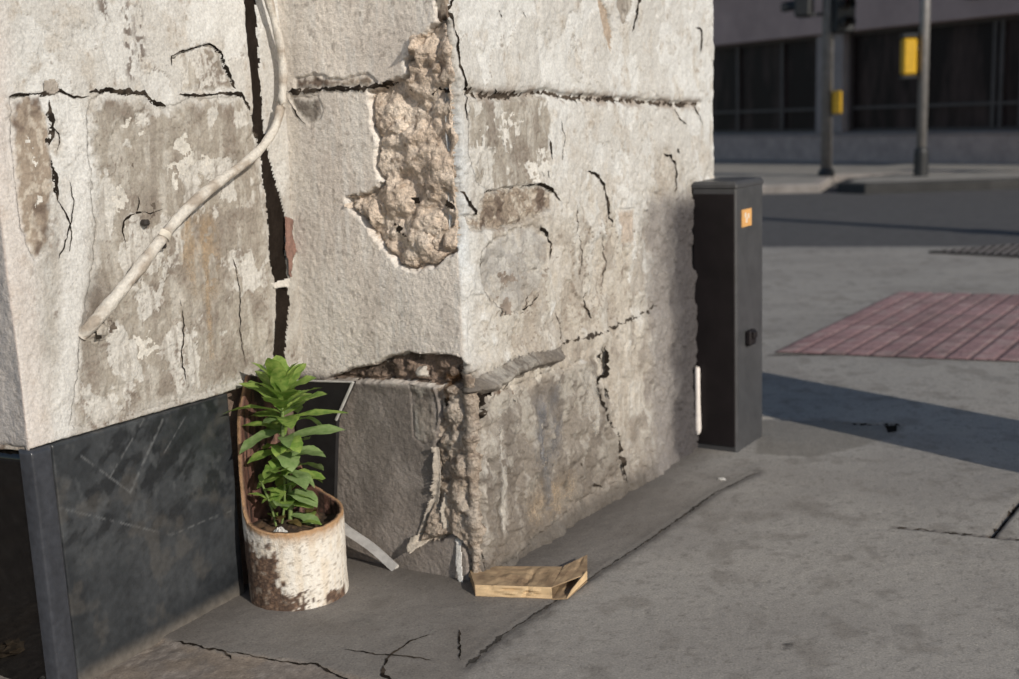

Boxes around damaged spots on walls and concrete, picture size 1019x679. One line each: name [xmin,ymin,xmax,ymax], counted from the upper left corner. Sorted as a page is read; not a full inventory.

crack [287,80,399,124]
crack [447,0,703,148]
crack [9,0,297,359]
spalling [290,0,561,316]
crack [460,191,478,214]
crack [665,149,680,192]
crack [179,300,187,379]
crack [555,171,657,481]
spalling [334,352,622,582]
crack [175,641,348,679]
crack [345,634,430,679]
crack [458,600,558,667]